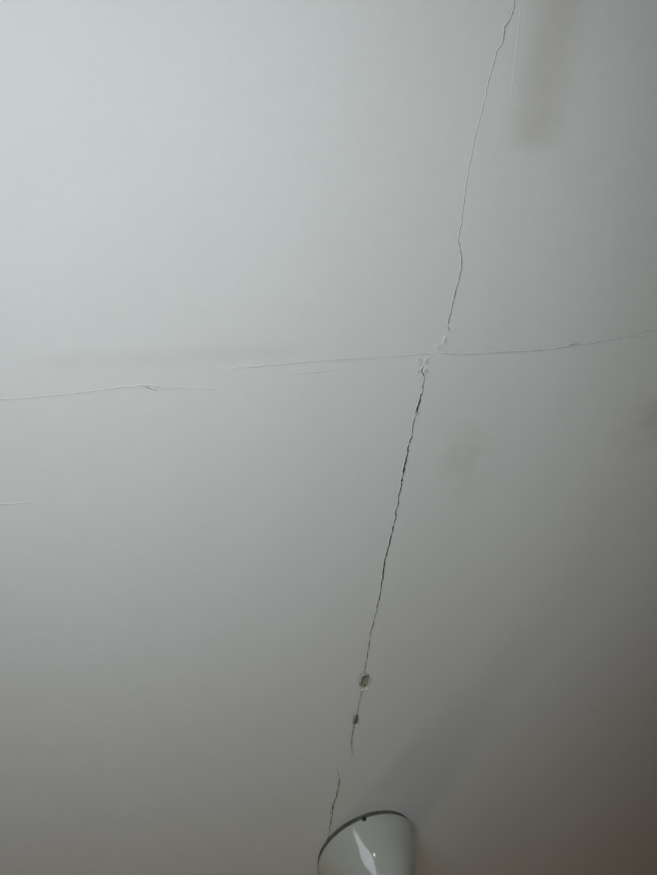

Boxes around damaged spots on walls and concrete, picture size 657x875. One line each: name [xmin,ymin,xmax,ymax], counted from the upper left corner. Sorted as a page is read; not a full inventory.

crack [351,0,657,752]
crack [326,768,342,840]